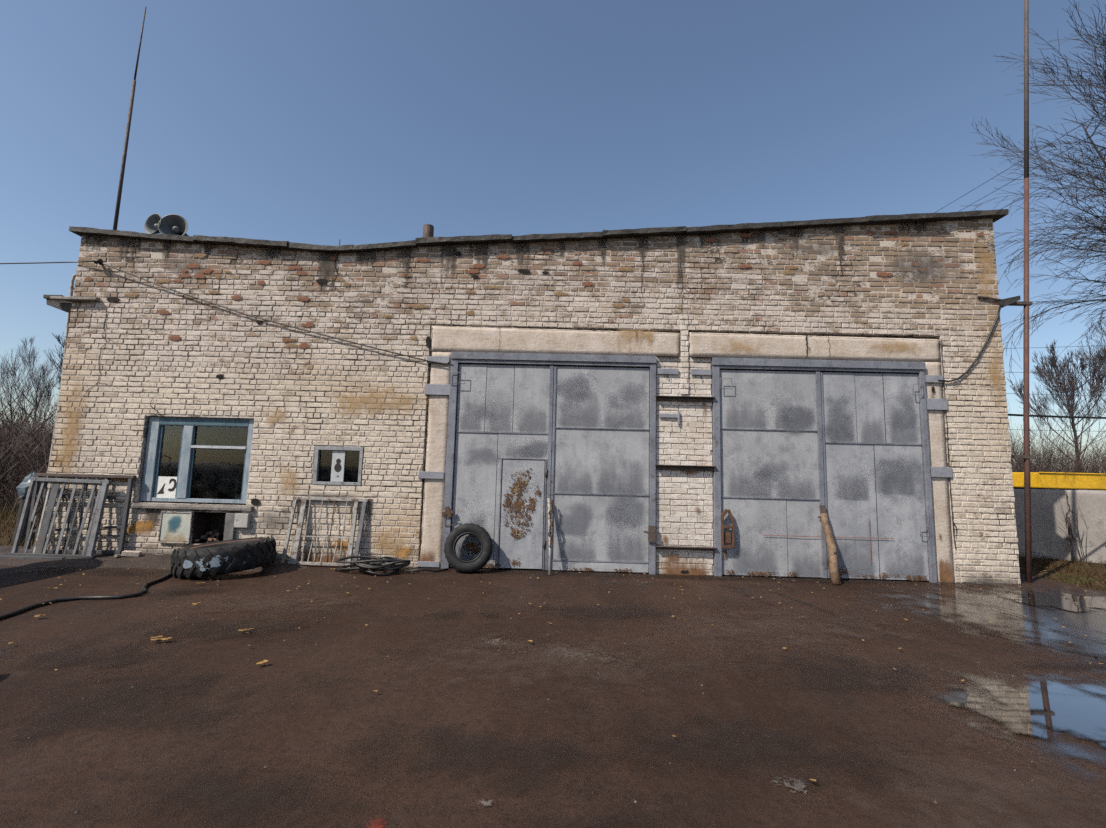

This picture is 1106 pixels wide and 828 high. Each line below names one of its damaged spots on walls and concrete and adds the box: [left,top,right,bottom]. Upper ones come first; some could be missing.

leakage [318,252,336,286]
leakage [358,251,374,264]
leakage [441,245,456,283]
leakage [638,237,648,259]
crack [77,311,116,416]